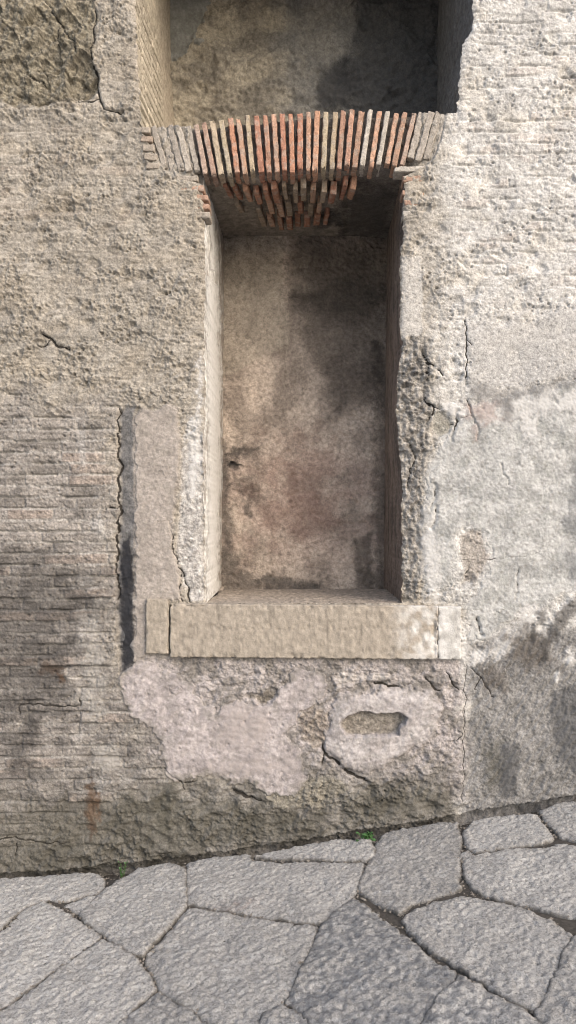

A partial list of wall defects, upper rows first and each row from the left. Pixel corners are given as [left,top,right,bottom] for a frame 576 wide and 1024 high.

crack [30,2,122,115]
crack [39,334,70,350]
crack [422,320,479,435]
leakage [121,538,132,579]
leakage [421,516,441,603]
leakage [460,605,553,663]
crack [321,743,369,782]
crack [374,665,494,802]
leakage [501,745,519,797]
leakage [551,649,576,771]